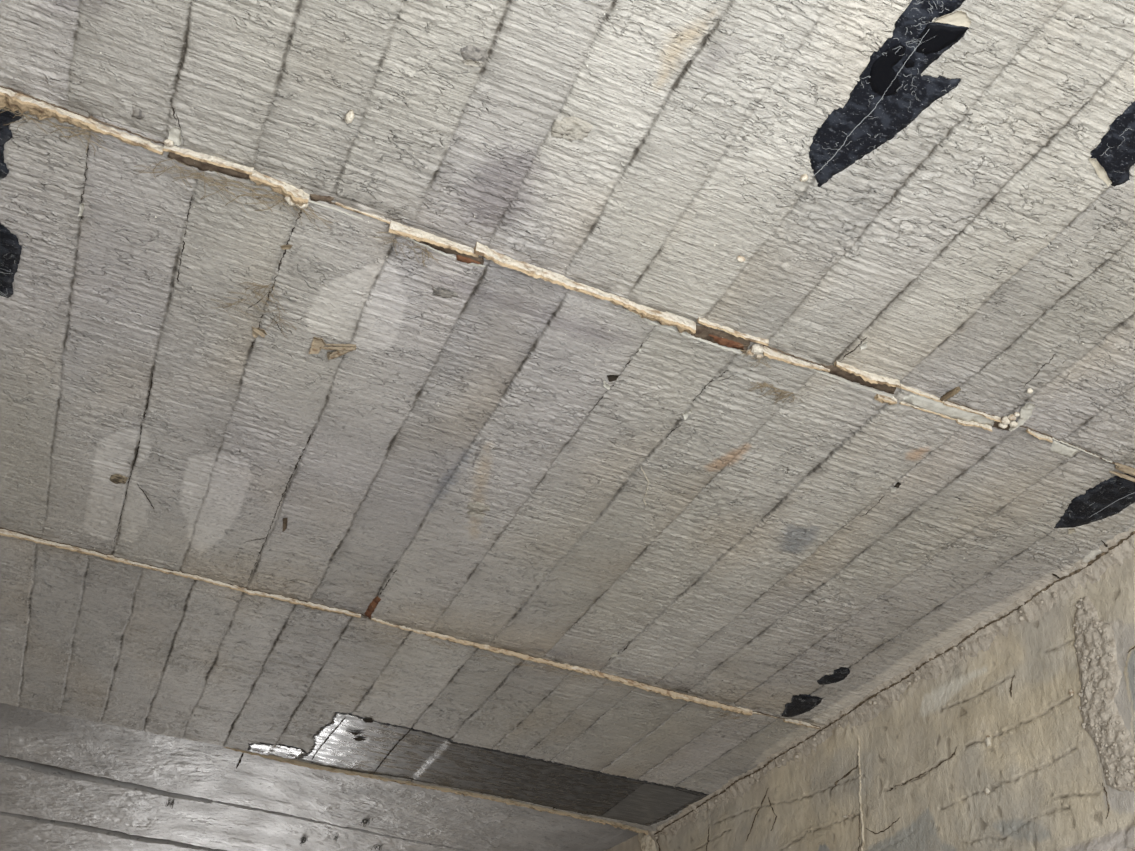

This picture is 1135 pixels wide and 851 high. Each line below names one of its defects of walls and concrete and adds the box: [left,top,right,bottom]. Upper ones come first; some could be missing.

peeling [809,0,971,188]
peeling [0,106,23,179]
crack [78,143,89,220]
peeling [1089,101,1135,187]
peeling [0,222,22,298]
crack [177,191,193,282]
crack [250,210,302,348]
crack [588,334,651,414]
crack [666,370,734,438]
peeling [1054,473,1135,534]
crack [647,527,1135,851]
peeling [236,712,709,851]